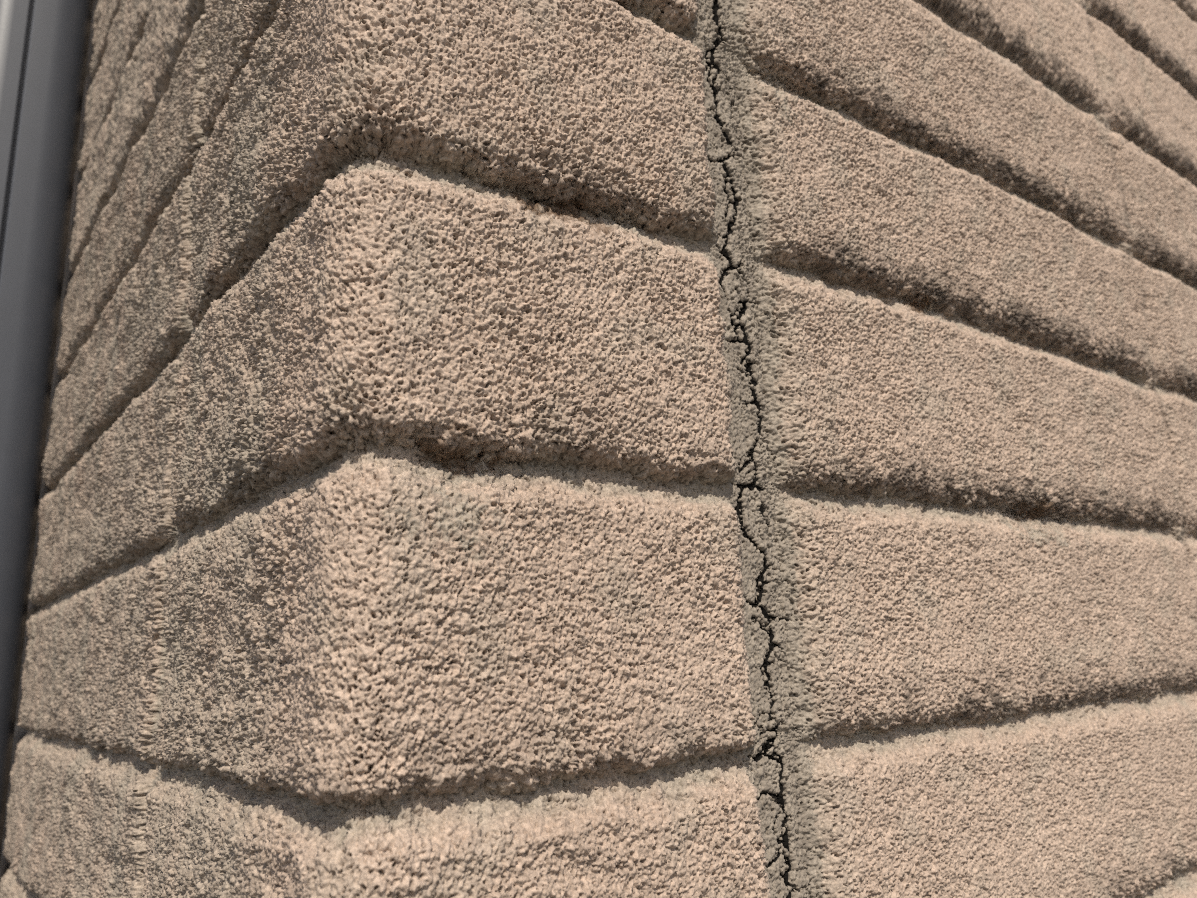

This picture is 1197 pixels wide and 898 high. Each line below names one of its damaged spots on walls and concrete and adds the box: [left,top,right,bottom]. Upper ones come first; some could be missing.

crack [705,0,797,898]